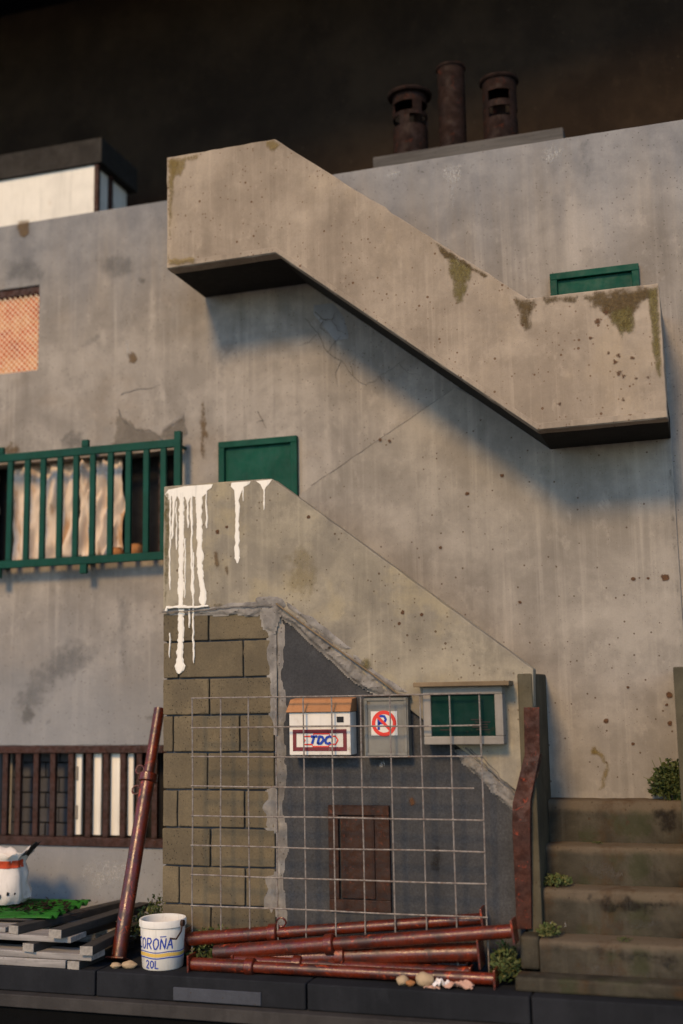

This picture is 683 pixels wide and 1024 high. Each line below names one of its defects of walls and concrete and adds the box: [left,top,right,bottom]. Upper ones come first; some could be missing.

water stain [649,288,661,376]
peeling [112,409,188,444]
water stain [165,487,244,674]
spalling [162,596,408,927]